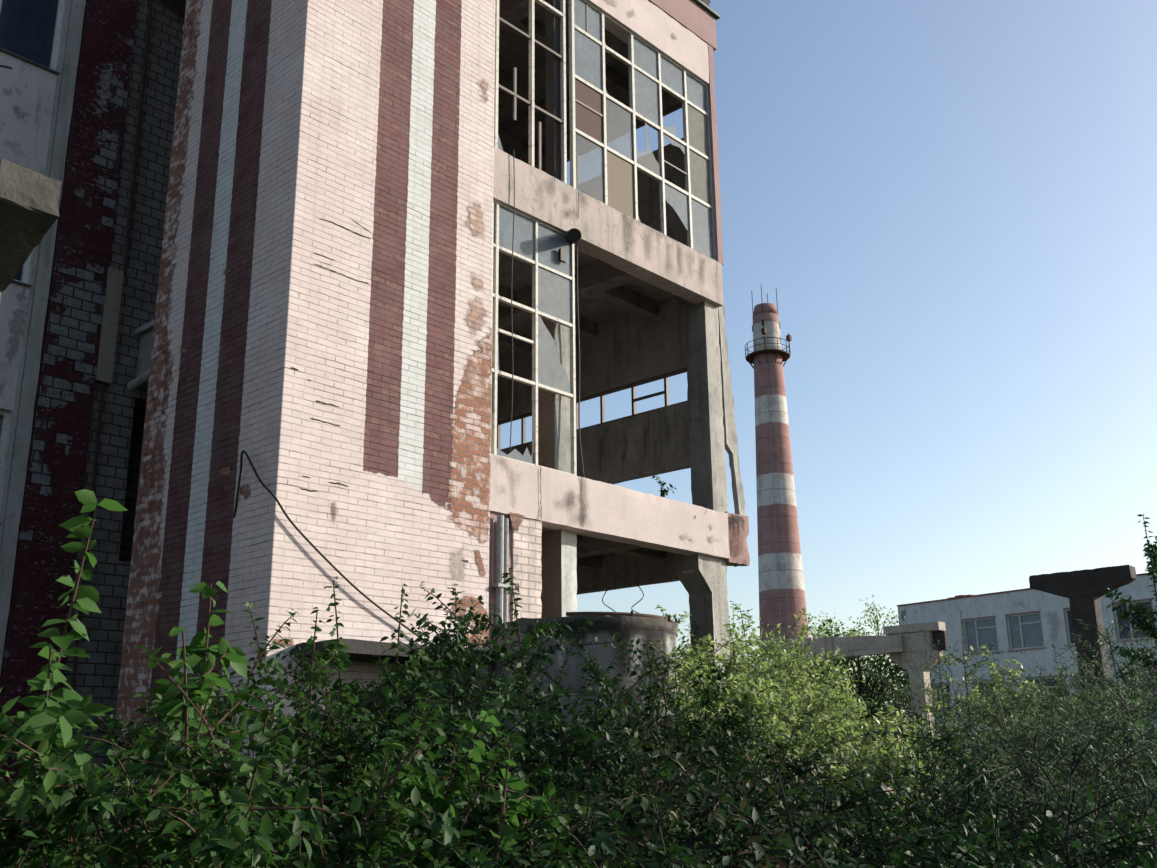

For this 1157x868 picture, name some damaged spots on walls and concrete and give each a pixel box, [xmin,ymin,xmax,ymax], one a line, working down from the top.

peeling [82,63,128,246]
crack [313,252,369,284]
peeling [466,203,485,237]
peeling [26,262,106,498]
peeling [112,0,203,764]
crack [291,367,340,426]
flaking render [445,274,492,647]
water stain [731,514,744,533]